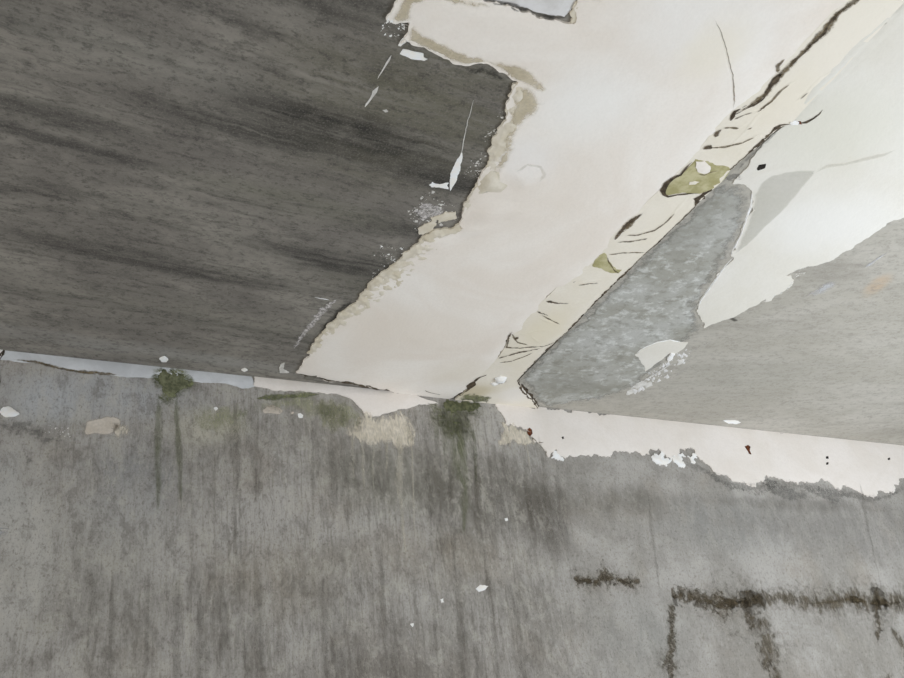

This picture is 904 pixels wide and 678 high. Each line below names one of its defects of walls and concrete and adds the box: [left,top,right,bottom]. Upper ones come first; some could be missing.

flaking render [296,0,904,399]
crack [425,0,904,408]
spalling [0,406,19,417]
water stain [348,412,415,448]
water stain [499,422,531,445]
flaking render [495,404,904,498]
mould [574,568,642,589]
water stain [663,586,904,678]